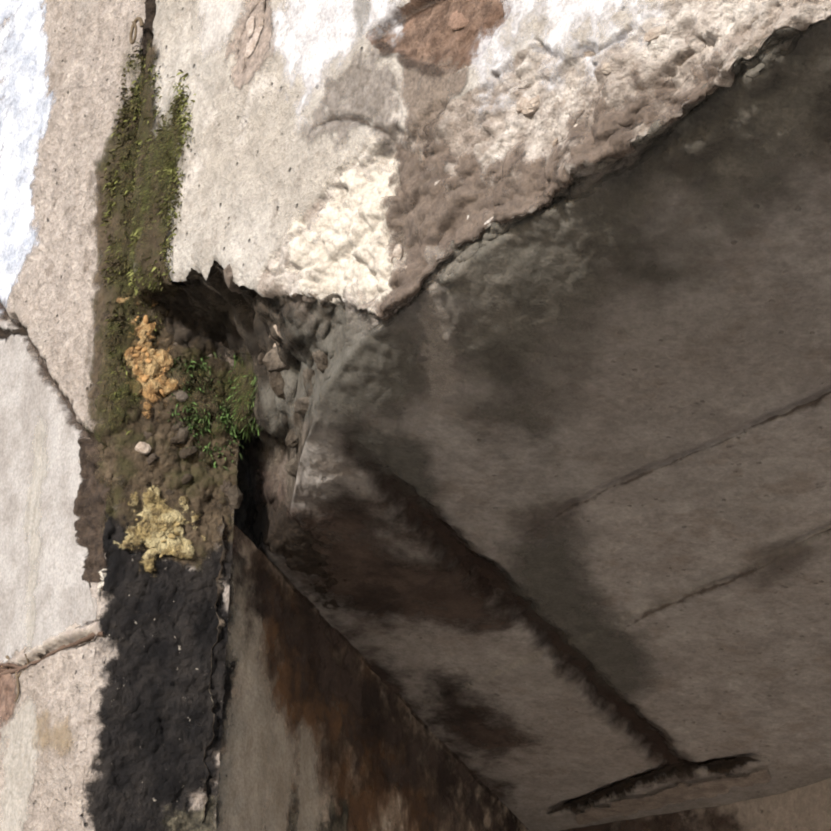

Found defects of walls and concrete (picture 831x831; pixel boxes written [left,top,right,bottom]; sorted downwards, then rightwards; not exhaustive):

crack [133,0,156,149]
spalling [150,0,831,549]
crack [0,302,92,439]
spalling [135,431,157,465]
crack [752,391,831,427]
crack [8,620,101,672]
water stain [84,513,349,831]
crack [344,432,778,824]
water stain [561,807,741,831]